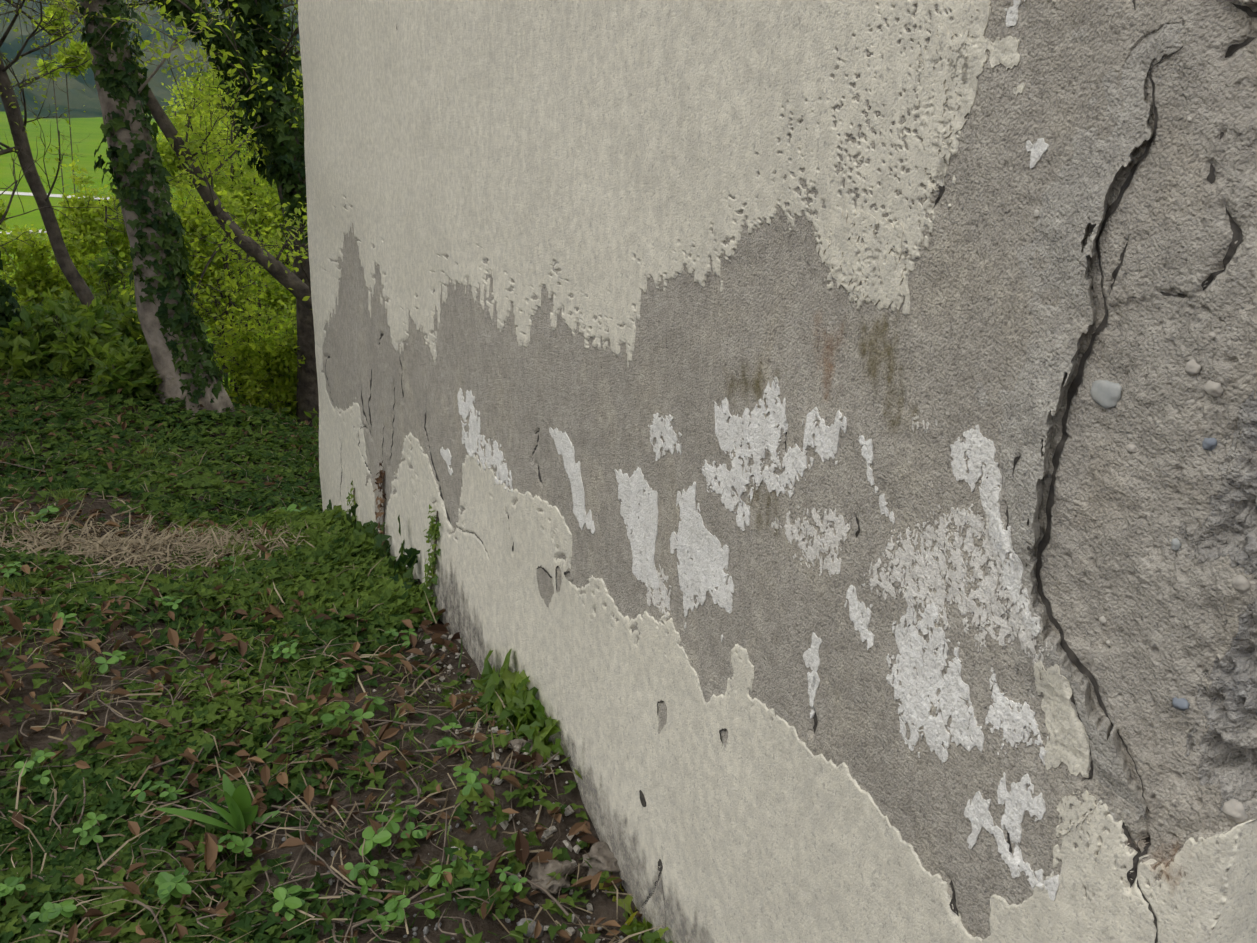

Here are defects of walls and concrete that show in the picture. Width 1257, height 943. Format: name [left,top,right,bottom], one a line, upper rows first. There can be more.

peeling [321,0,1257,939]
crack [1005,832,1013,853]
crack [1005,455,1021,530]
crack [1035,46,1183,943]